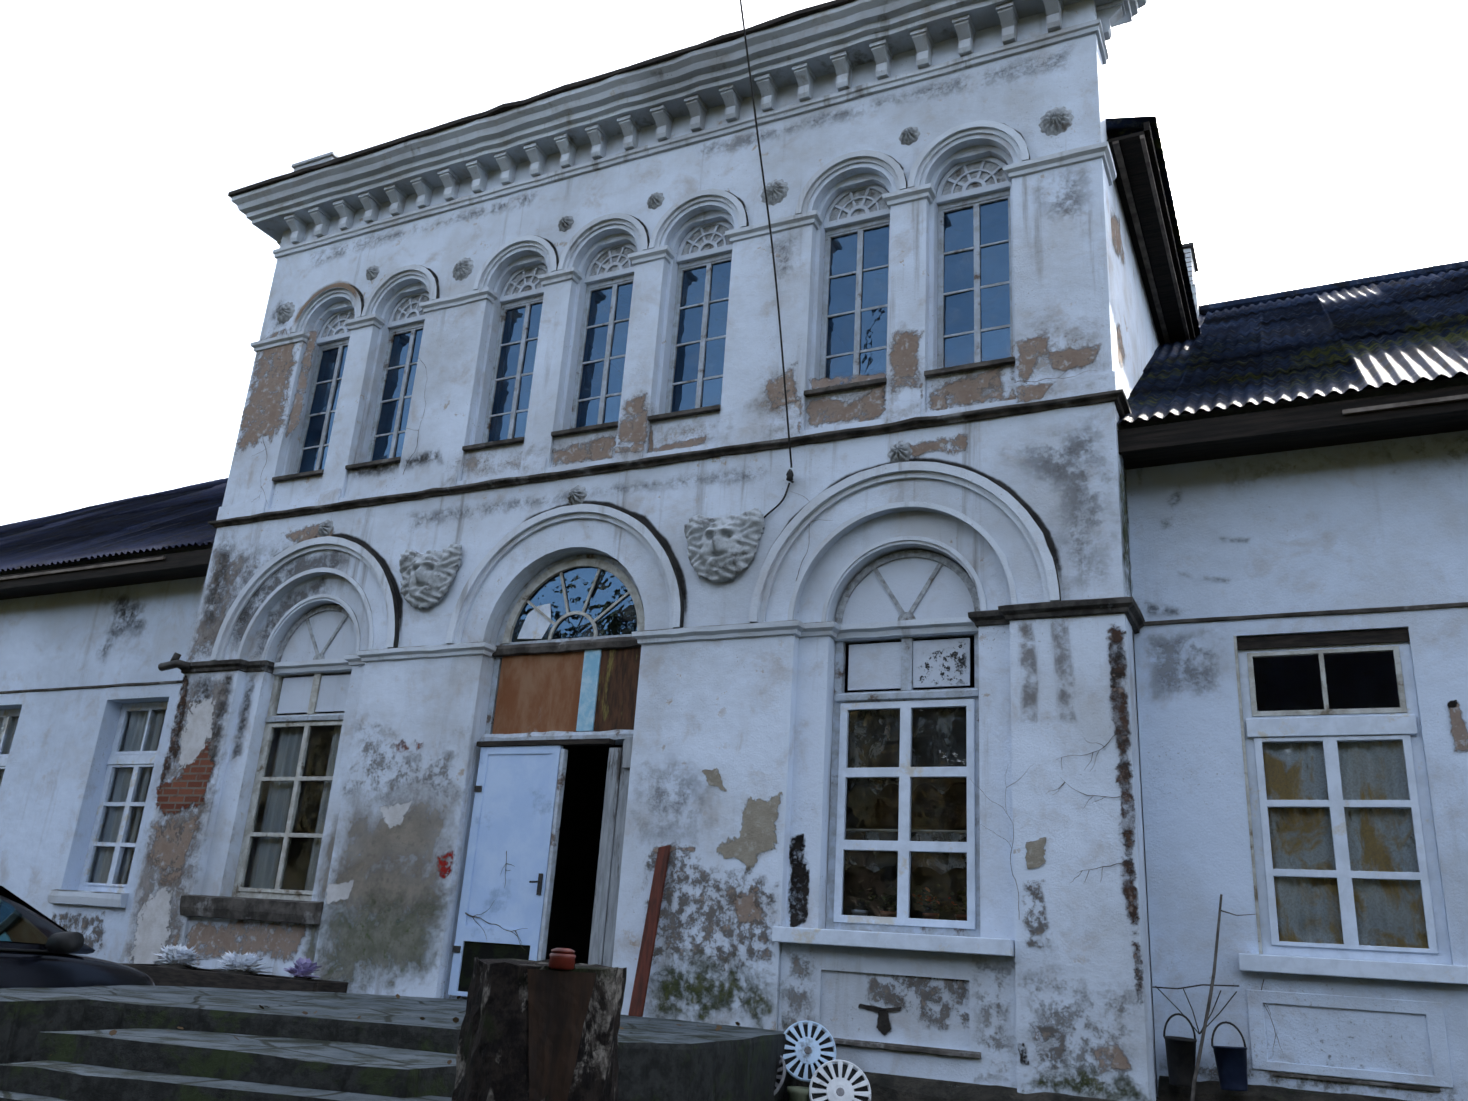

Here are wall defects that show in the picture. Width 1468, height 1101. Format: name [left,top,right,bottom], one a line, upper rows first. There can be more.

peeling [235,329,318,451]
peeling [552,393,706,465]
peeling [758,324,1125,430]
damp [825,457,1061,571]
damp [1039,441,1086,562]
peeling [1447,700,1468,752]
peeling [128,675,306,965]
damp [303,742,453,990]
peeling [646,792,810,971]
damp [784,955,809,1031]
damp [868,967,1009,1049]
damp [1031,979,1125,1077]